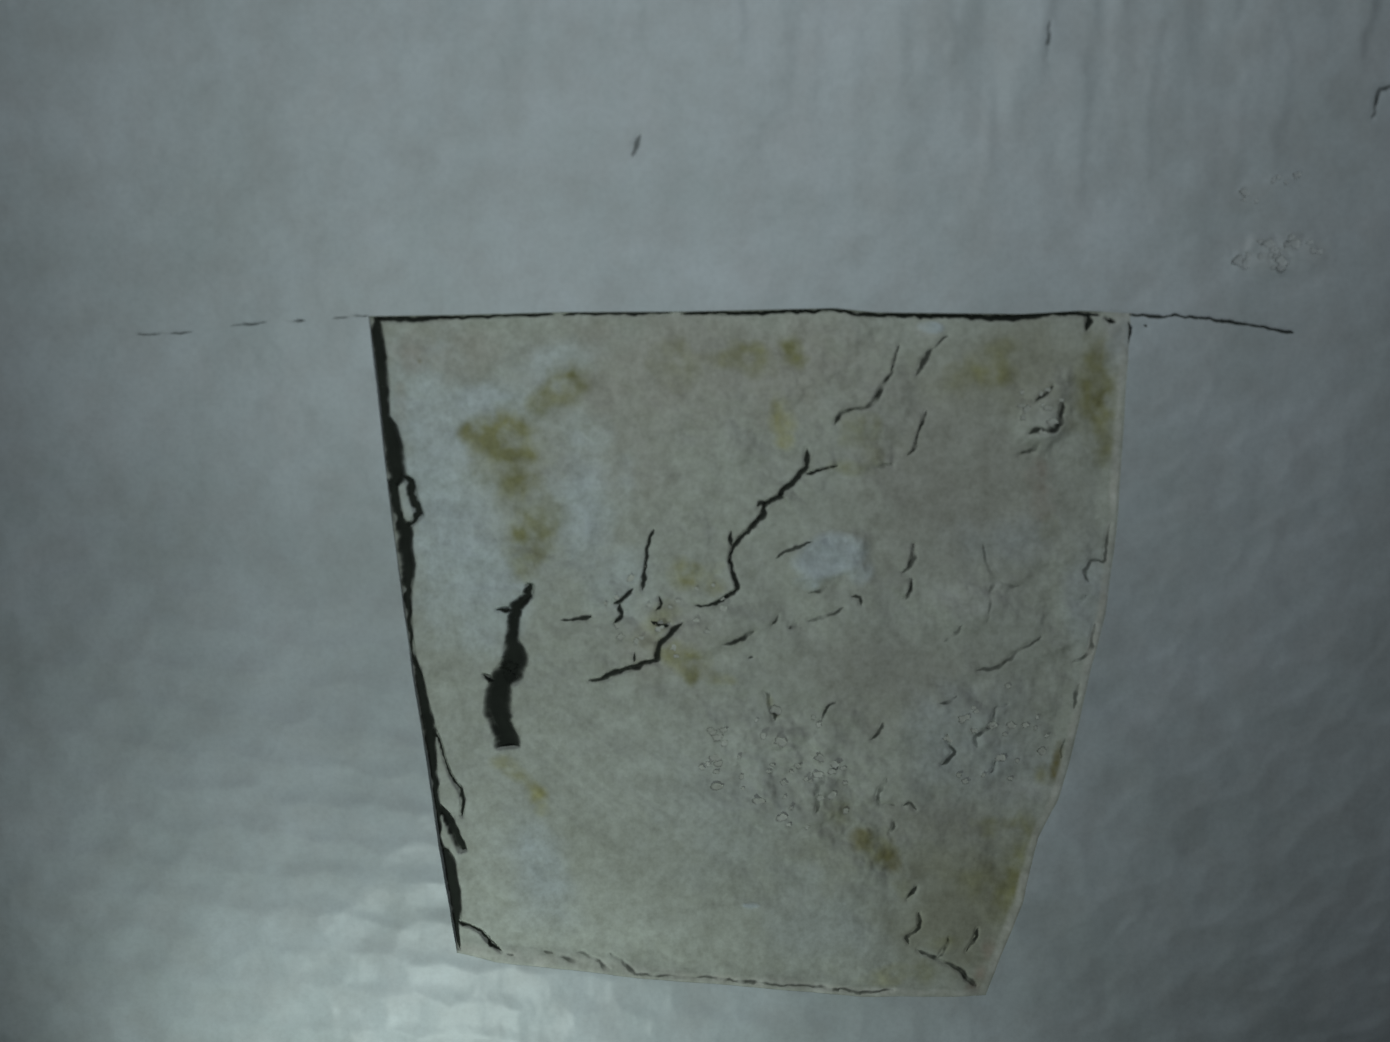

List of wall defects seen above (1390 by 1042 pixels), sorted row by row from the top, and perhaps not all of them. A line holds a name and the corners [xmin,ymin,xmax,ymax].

damp [451,355,596,599]
damp [641,331,813,453]
damp [823,409,888,480]
damp [933,333,1024,401]
damp [1068,325,1125,472]
damp [660,647,739,689]
flaking render [369,308,1131,997]
crack [365,309,1294,984]
damp [485,752,551,819]
damp [846,807,1039,928]
crack [703,976,885,993]